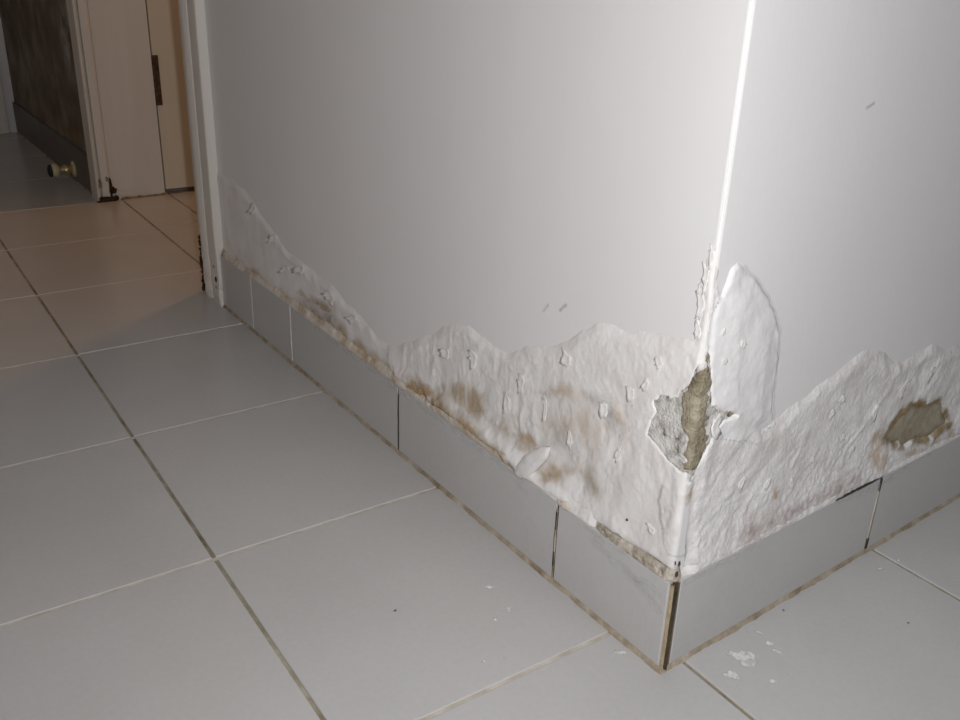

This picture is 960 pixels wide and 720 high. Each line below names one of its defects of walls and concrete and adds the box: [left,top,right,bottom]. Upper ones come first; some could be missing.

peeling [217,0,960,582]